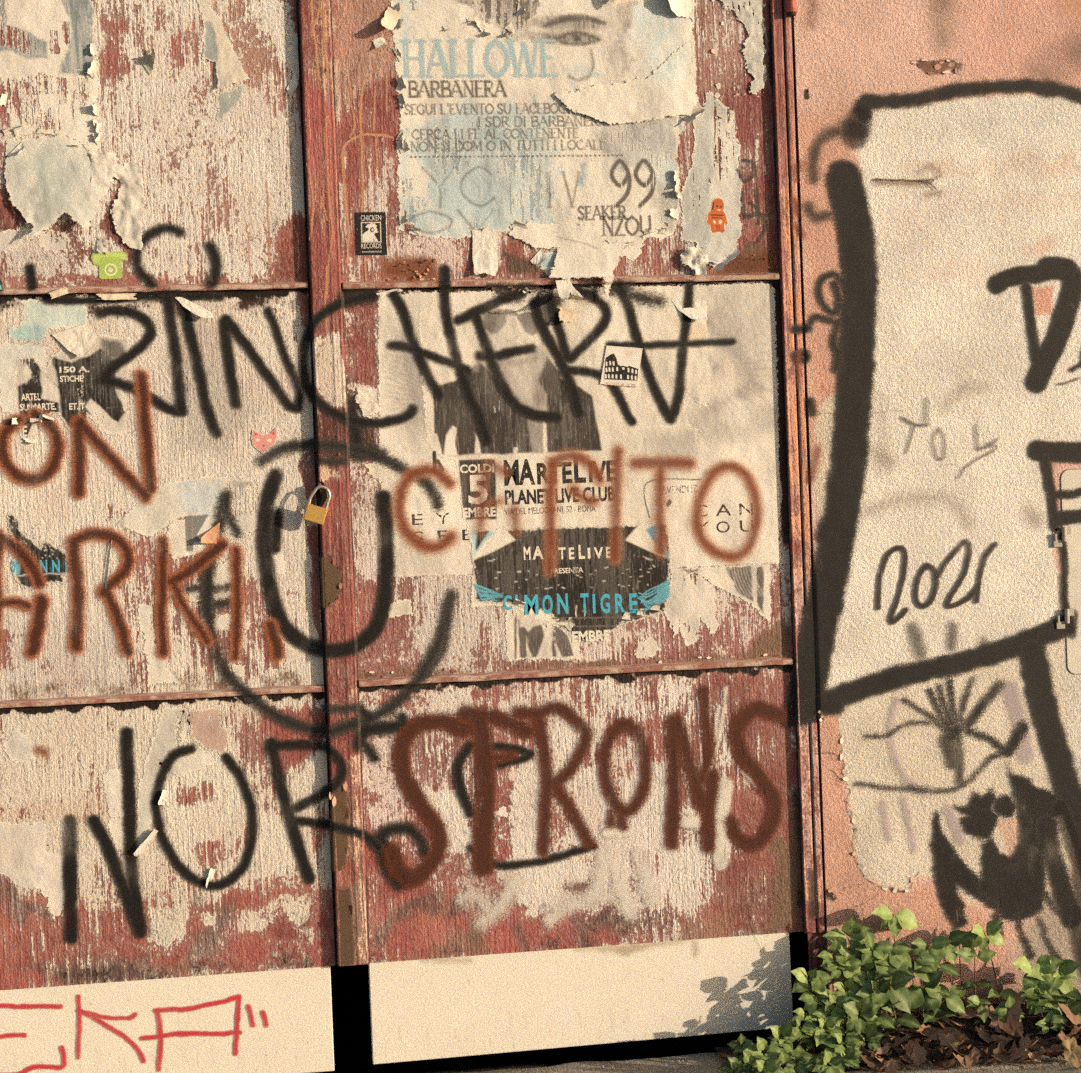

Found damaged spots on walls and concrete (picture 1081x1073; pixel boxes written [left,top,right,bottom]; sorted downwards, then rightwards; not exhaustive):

flaking render [909,59,962,75]